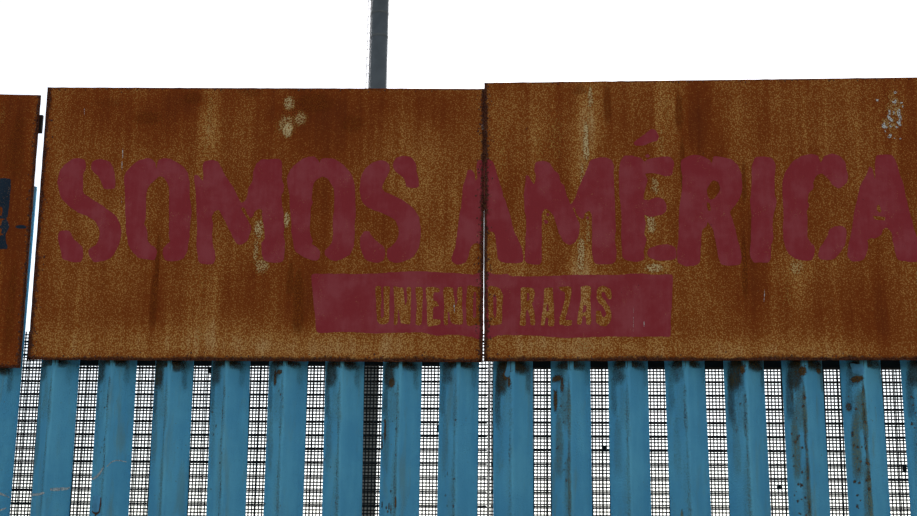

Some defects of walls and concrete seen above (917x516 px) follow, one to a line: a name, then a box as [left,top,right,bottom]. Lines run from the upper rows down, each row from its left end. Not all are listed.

corrosion [0,77,917,450]